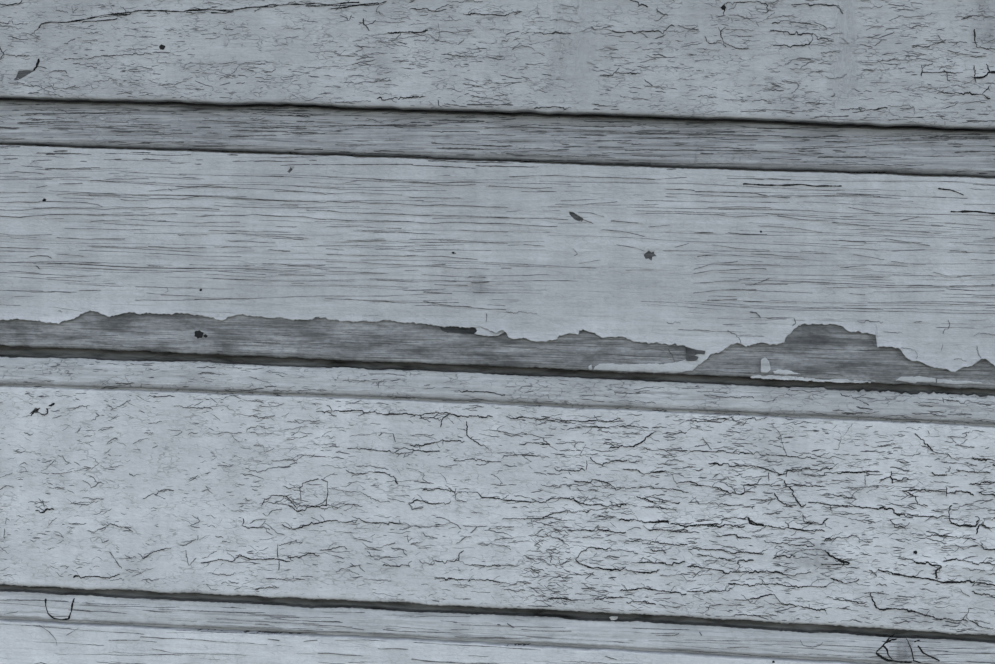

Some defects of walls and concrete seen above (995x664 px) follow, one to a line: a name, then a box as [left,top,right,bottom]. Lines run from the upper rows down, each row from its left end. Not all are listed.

crack [0,0,995,362]
peeling [0,311,995,389]
crack [0,362,995,664]